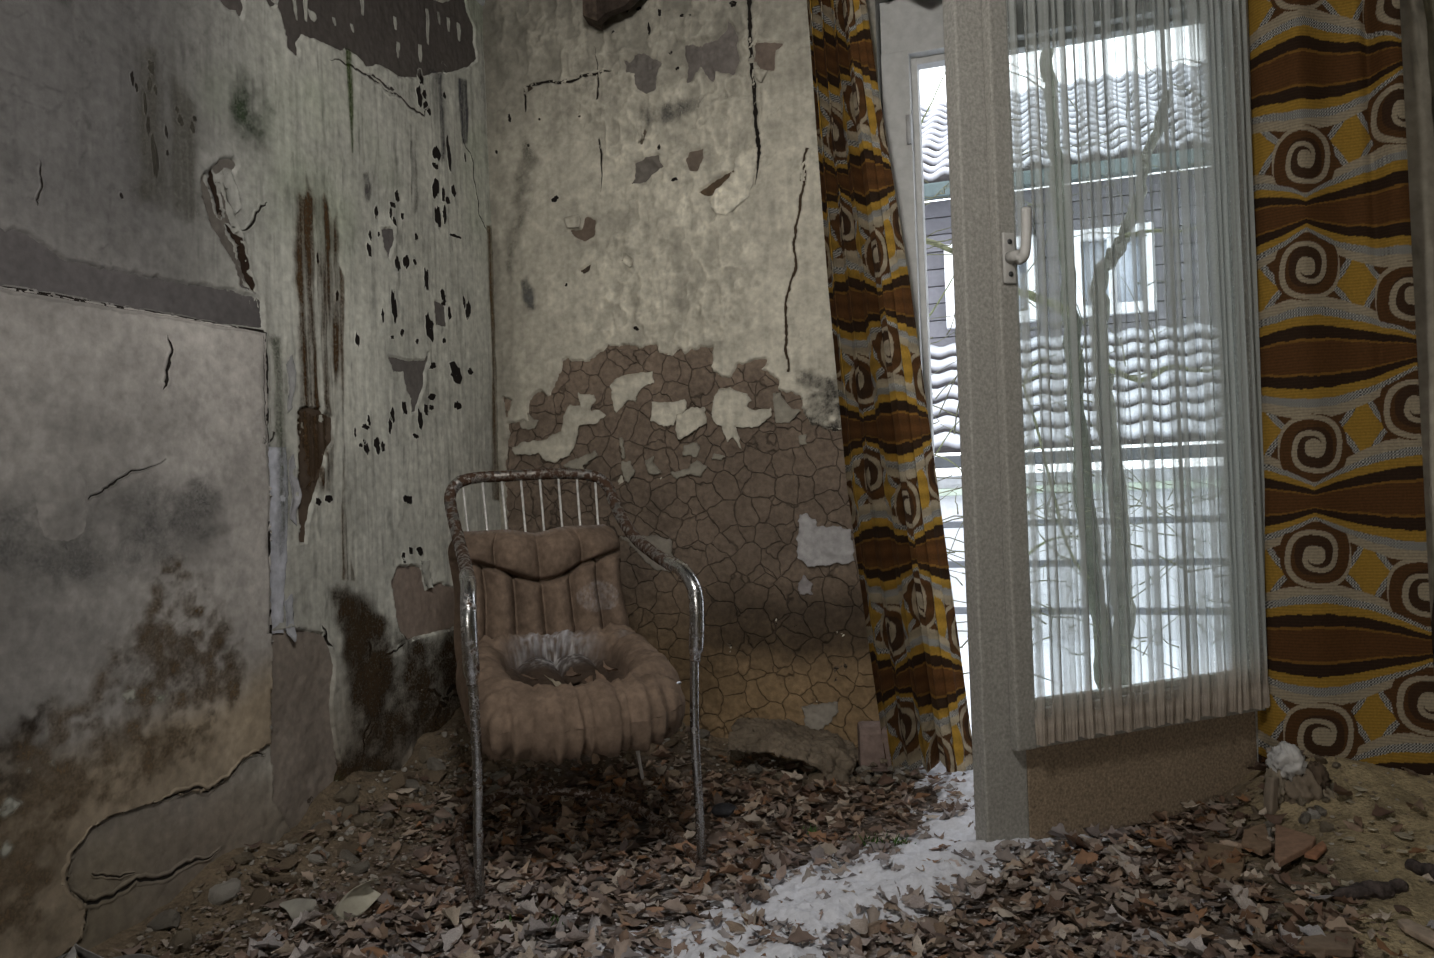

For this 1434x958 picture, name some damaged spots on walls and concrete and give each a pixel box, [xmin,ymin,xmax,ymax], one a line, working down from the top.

peeling [0,159,261,328]
peeling [266,0,476,117]
spalling [353,188,474,457]
crack [522,46,611,113]
crack [596,134,605,196]
peeling [625,0,783,94]
crack [743,0,764,184]
crack [781,147,812,373]
water stain [0,562,240,933]
peeling [268,355,337,829]
water stain [331,588,461,781]
peeling [504,325,880,763]